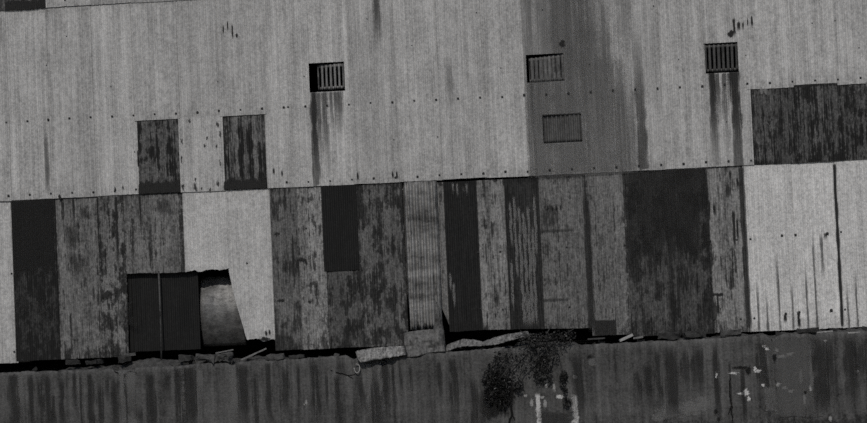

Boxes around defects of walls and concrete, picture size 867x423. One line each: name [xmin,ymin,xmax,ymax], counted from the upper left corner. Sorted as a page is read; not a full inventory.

rust [310,92,343,174]
rust [709,72,742,152]
rust [622,168,716,276]
damp [7,372,157,423]
damp [165,369,203,419]
damp [229,364,299,421]
damp [357,361,411,421]
damp [634,352,747,422]
damp [756,346,770,412]
damp [812,342,867,400]